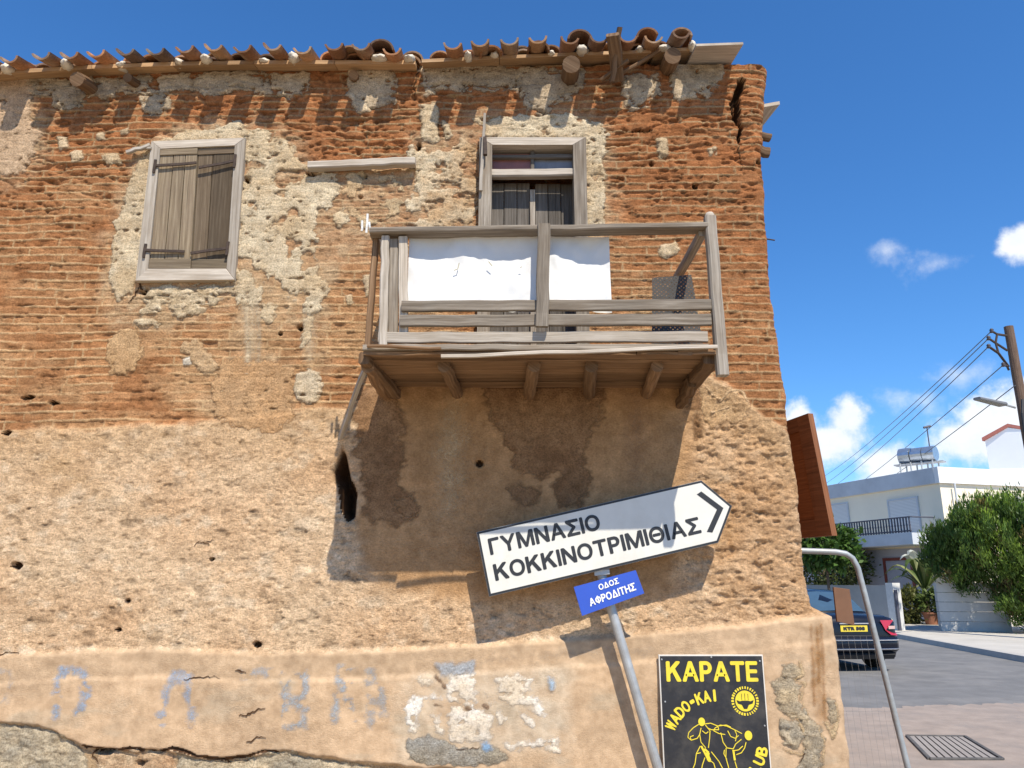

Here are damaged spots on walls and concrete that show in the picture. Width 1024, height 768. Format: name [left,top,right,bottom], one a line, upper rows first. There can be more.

peeling [0,70,311,176]
flaking render [656,137,669,159]
peeling [620,64,725,112]
crack [729,78,745,165]
peeling [108,65,610,348]
flaking render [658,242,680,258]
peeling [180,338,218,375]
spalling [335,385,421,528]
peeling [687,385,751,441]
crack [81,708,279,764]
peeling [404,673,561,767]
spalling [771,661,839,768]